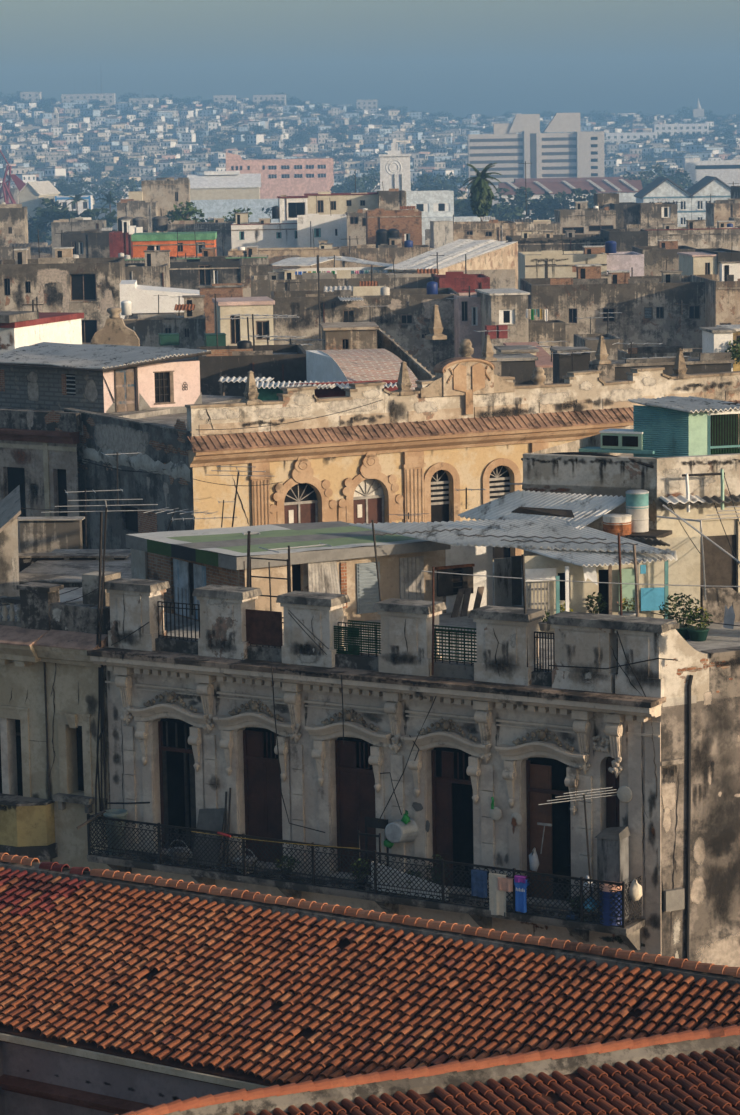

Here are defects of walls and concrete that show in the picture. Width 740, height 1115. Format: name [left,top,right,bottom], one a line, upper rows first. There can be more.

damp [526,458,653,490]
damp [682,459,740,473]
damp [206,631,232,651]
damp [626,650,661,686]
damp [690,702,738,919]
damp [700,934,740,967]